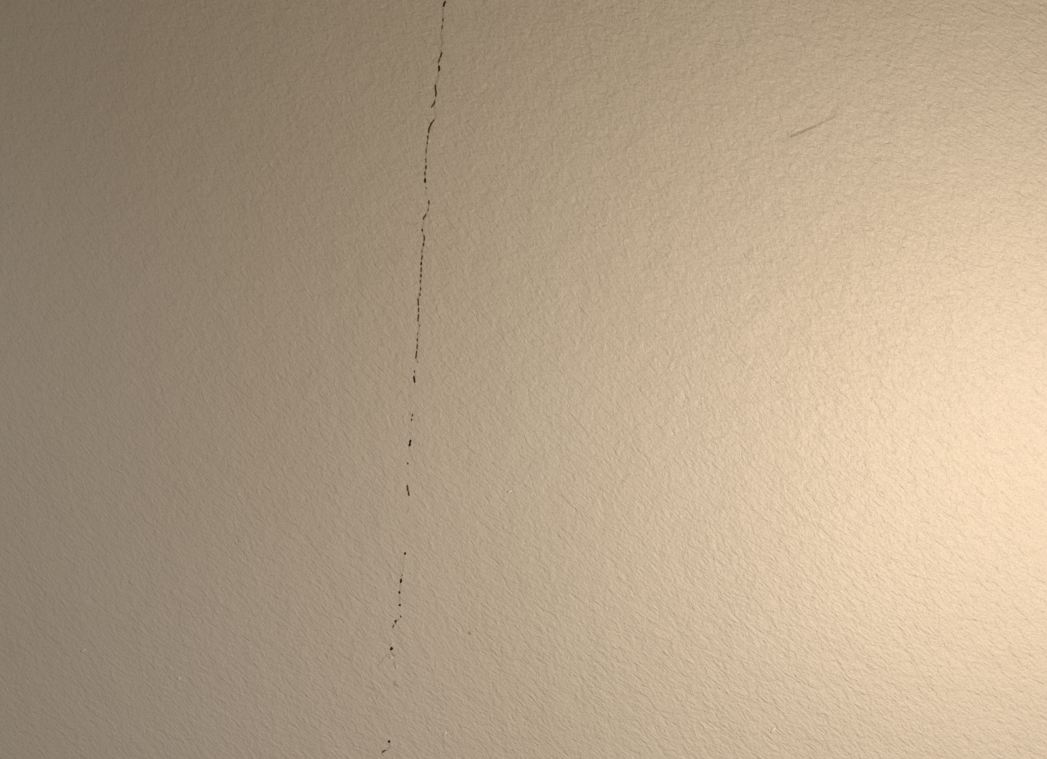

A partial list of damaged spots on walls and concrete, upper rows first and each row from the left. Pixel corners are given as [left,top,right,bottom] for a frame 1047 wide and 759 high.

crack [413,1,446,383]
crack [389,552,406,669]